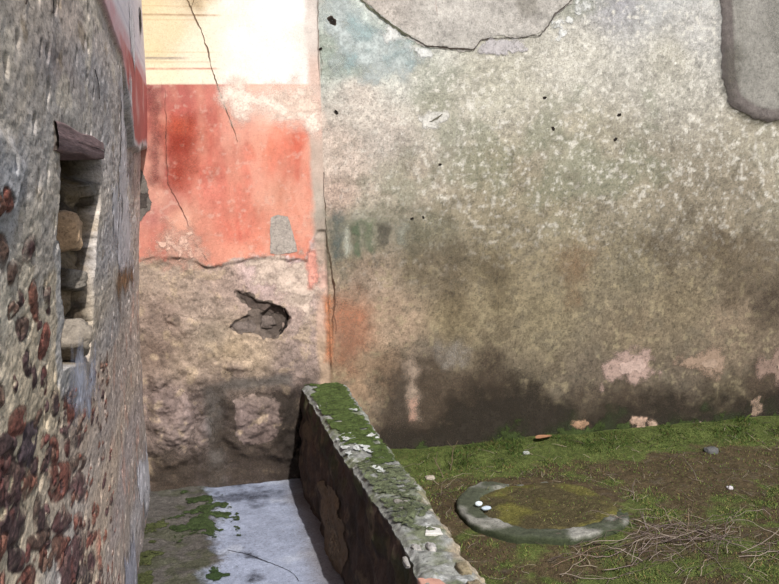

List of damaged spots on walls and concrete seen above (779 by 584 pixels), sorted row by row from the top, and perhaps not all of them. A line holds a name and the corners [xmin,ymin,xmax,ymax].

crack [187,0,238,141]
crack [165,90,207,260]
flaking render [112,73,326,516]
water stain [377,348,779,449]
peeling [601,347,662,391]
peeling [674,348,725,381]
peeling [756,348,779,387]